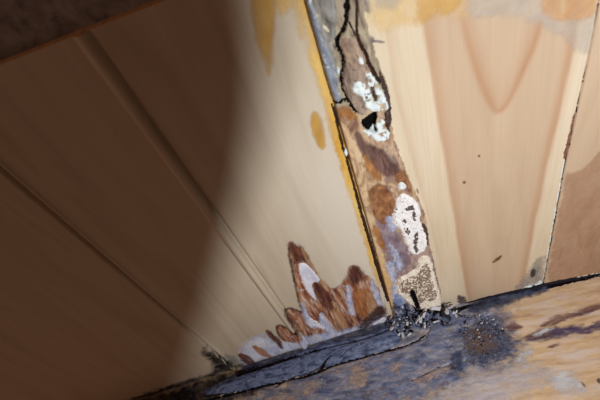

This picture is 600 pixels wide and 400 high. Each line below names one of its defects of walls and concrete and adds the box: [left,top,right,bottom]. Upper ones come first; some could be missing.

peeling [305,0,389,115]
crack [331,0,389,301]
leakage [133,0,596,400]
peeling [363,119,391,142]
peeling [298,263,320,299]
leakage [525,305,600,348]